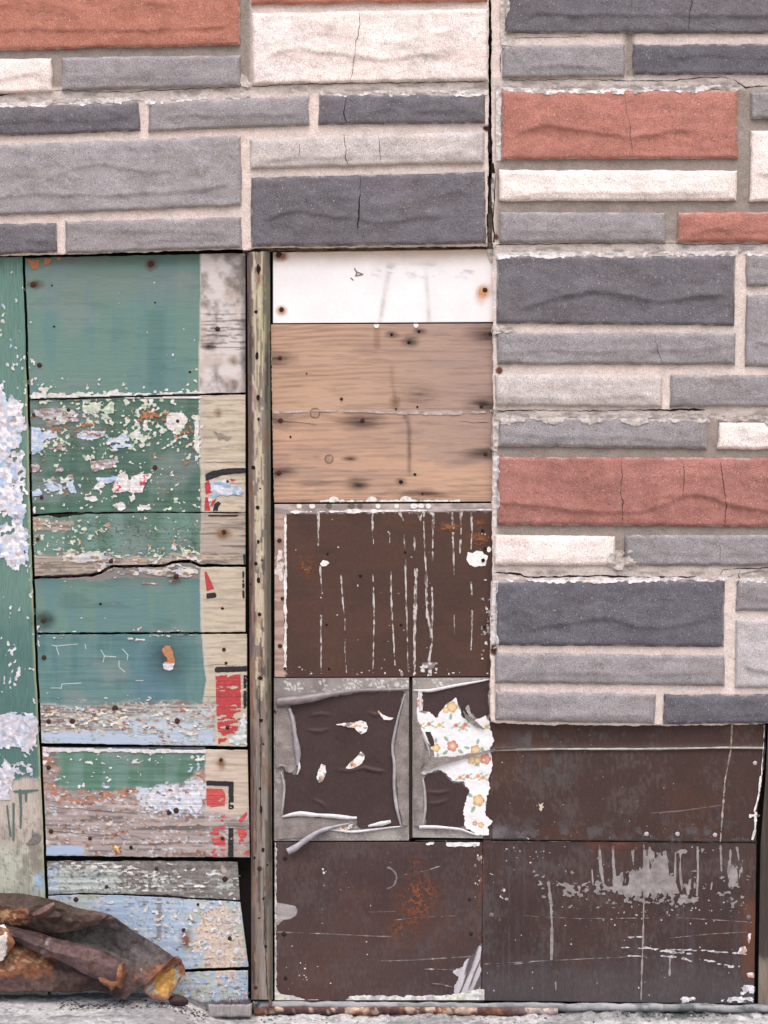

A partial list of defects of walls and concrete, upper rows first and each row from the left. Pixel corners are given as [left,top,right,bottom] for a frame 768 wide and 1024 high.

crack [54,0,768,253]
peeling [1,637,34,693]
crack [33,565,162,578]
peeling [0,287,244,647]
peeling [399,663,460,676]
spalling [273,410,768,674]
peeling [0,693,249,1002]
peeling [506,812,751,926]